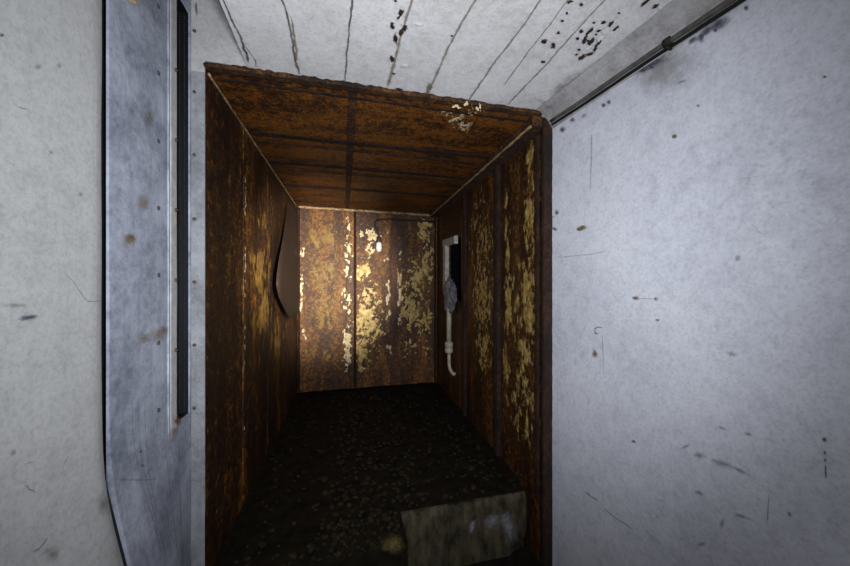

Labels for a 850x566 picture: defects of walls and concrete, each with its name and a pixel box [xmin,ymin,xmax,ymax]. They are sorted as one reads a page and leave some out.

peeling [437,101,487,131]
peeling [300,216,434,374]
peeling [469,140,535,447]